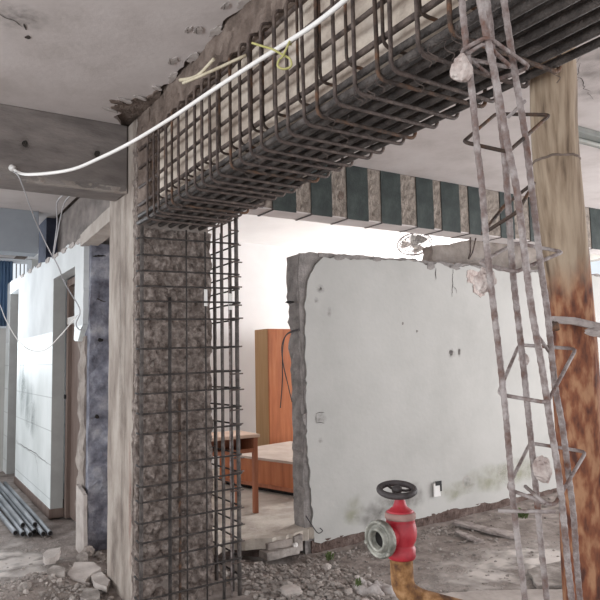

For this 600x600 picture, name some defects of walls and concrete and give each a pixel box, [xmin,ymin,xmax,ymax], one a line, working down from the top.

flaking render [102,0,272,140]
spalling [296,175,310,213]
spalling [331,167,346,217]
spalling [367,169,380,222]
spalling [400,174,416,226]
spalling [432,180,441,229]
spalling [459,185,468,232]
spalling [486,190,500,236]
spalling [513,194,530,240]
spalling [20,147,214,600]
flaking render [290,253,486,528]